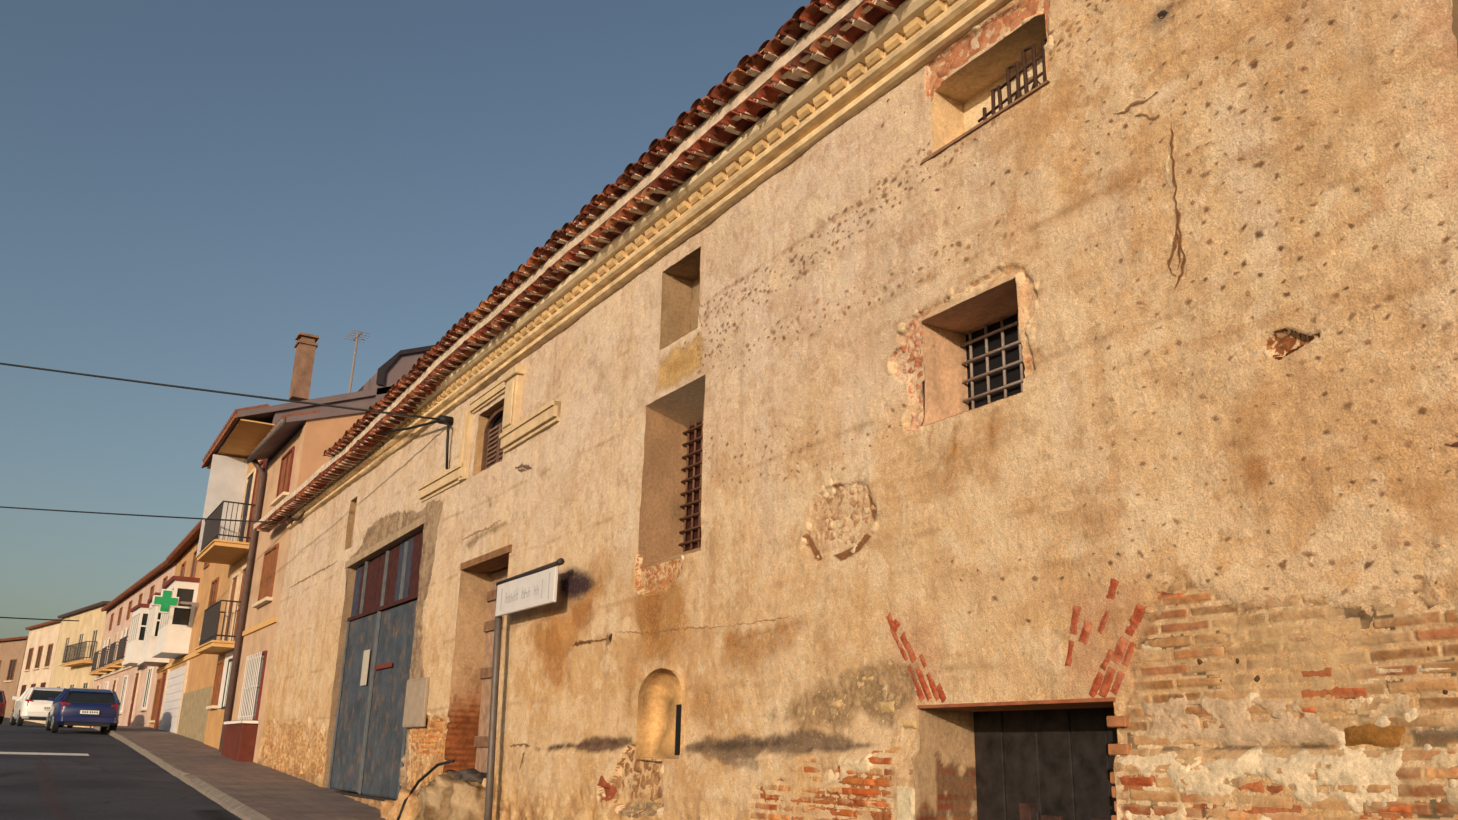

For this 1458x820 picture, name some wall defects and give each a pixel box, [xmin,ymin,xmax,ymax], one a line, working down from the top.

flaking render [1173,56,1316,193]
crack [1113,92,1186,287]
flaking render [1263,256,1320,376]
flaking render [635,552,684,595]
leakage [549,737,632,752]
flaking render [597,744,664,818]
leakage [687,731,857,765]
flaking render [749,612,946,820]
flaking render [1065,519,1458,820]